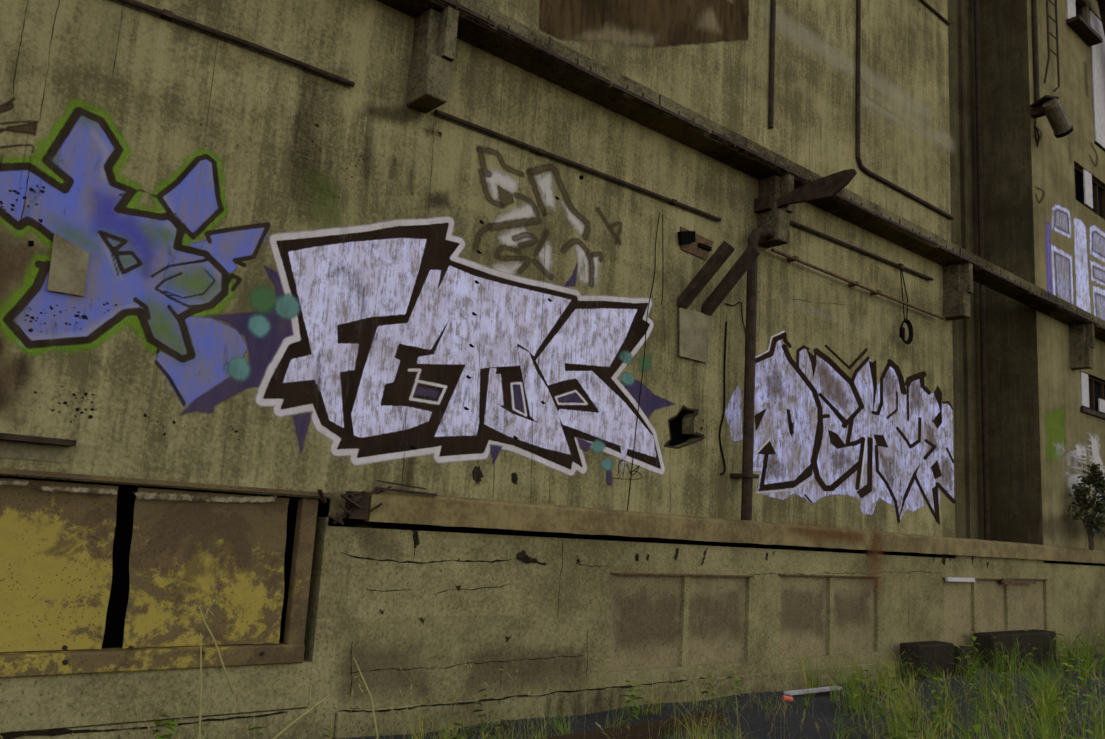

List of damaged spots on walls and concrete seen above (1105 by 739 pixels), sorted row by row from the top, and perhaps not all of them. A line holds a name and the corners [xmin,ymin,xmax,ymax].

crack [341,534,610,619]